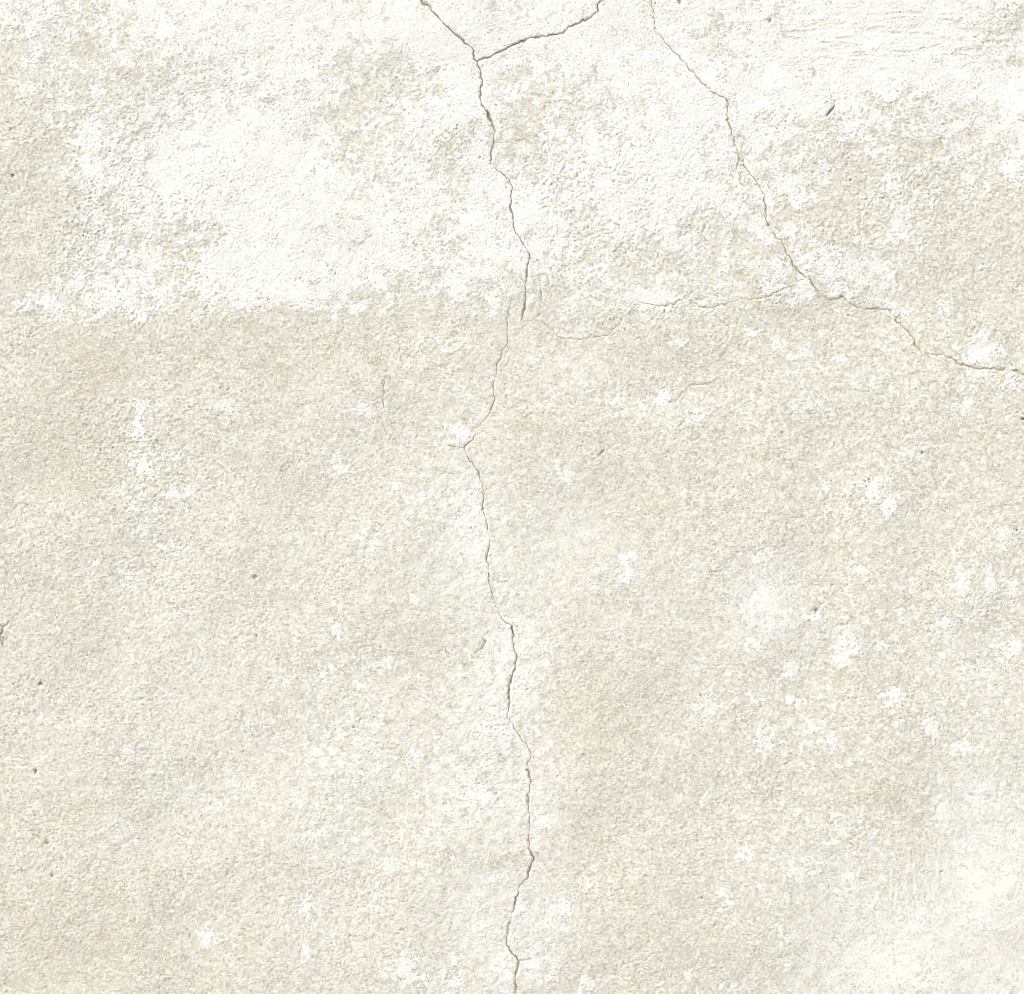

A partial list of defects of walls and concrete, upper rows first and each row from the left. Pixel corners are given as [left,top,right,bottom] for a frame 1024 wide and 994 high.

crack [420,0,1024,993]